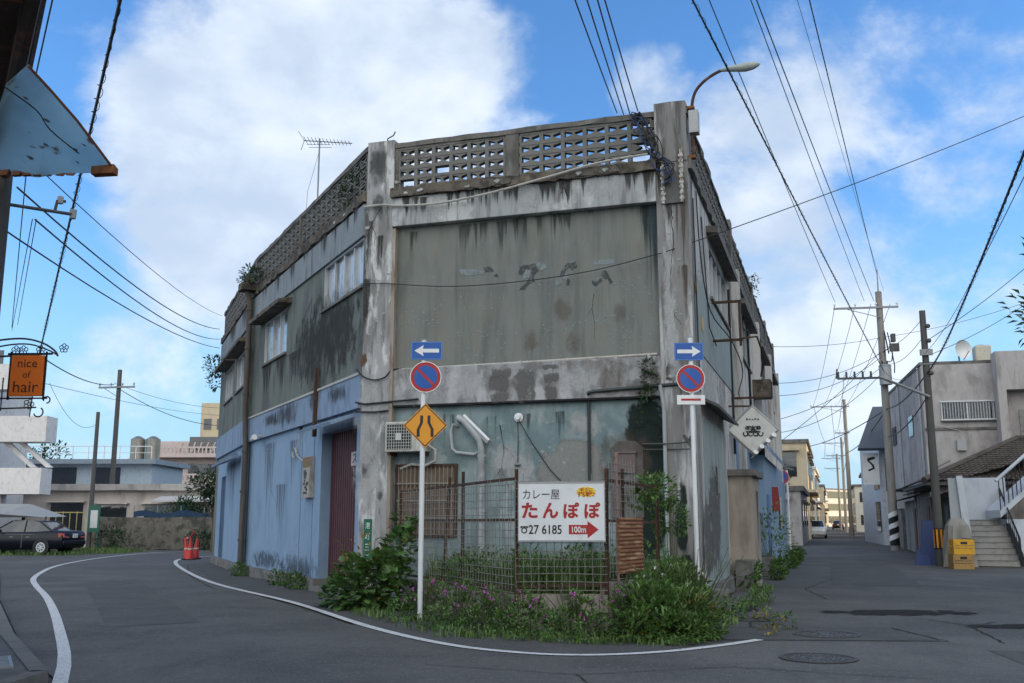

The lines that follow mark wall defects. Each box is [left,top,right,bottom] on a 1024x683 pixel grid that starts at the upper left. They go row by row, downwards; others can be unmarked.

leakage [402,197,427,213]
leakage [447,186,518,208]
leakage [539,178,586,200]
leakage [367,221,383,258]
leakage [262,279,370,390]
leakage [489,364,559,402]
leakage [267,405,291,424]